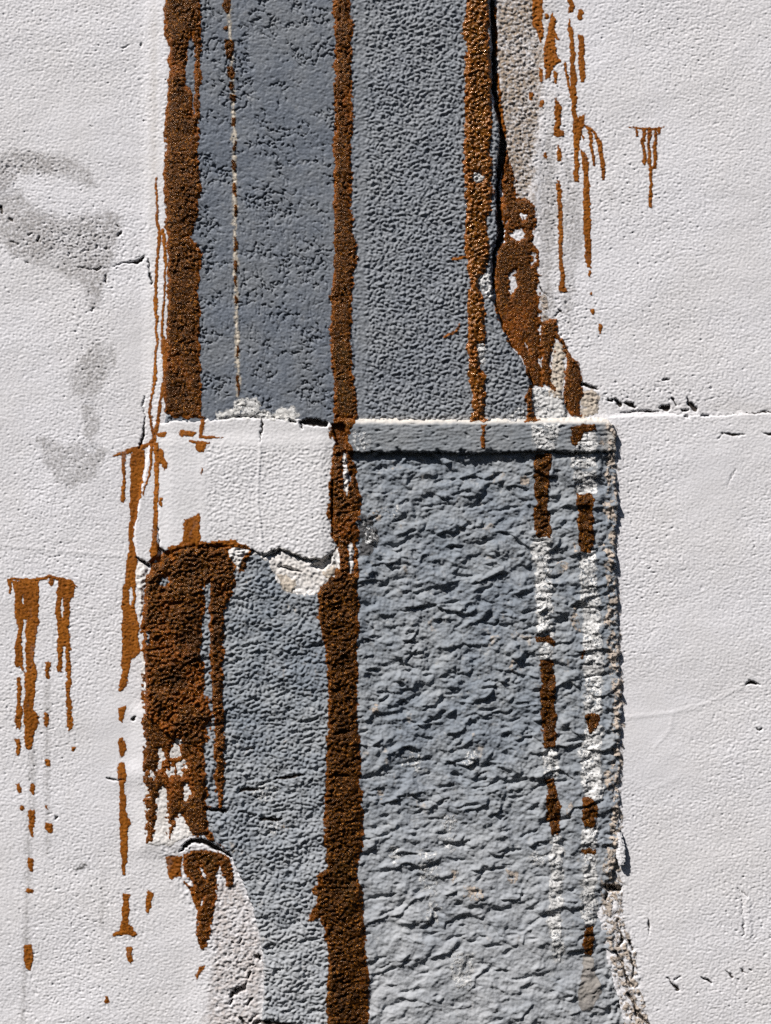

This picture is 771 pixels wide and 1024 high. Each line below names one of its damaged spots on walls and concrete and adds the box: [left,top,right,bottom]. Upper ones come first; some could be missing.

rust [443,0,605,449]
rust [629,126,664,208]
flaking render [135,561,147,616]
rust [113,0,252,950]
flaking render [228,508,382,596]
rust [308,0,371,1024]
flaking render [342,431,370,494]
crack [705,411,771,436]
rust [7,574,78,756]
rust [539,659,558,749]
peeling [530,423,650,1024]
flaking render [209,883,261,1024]